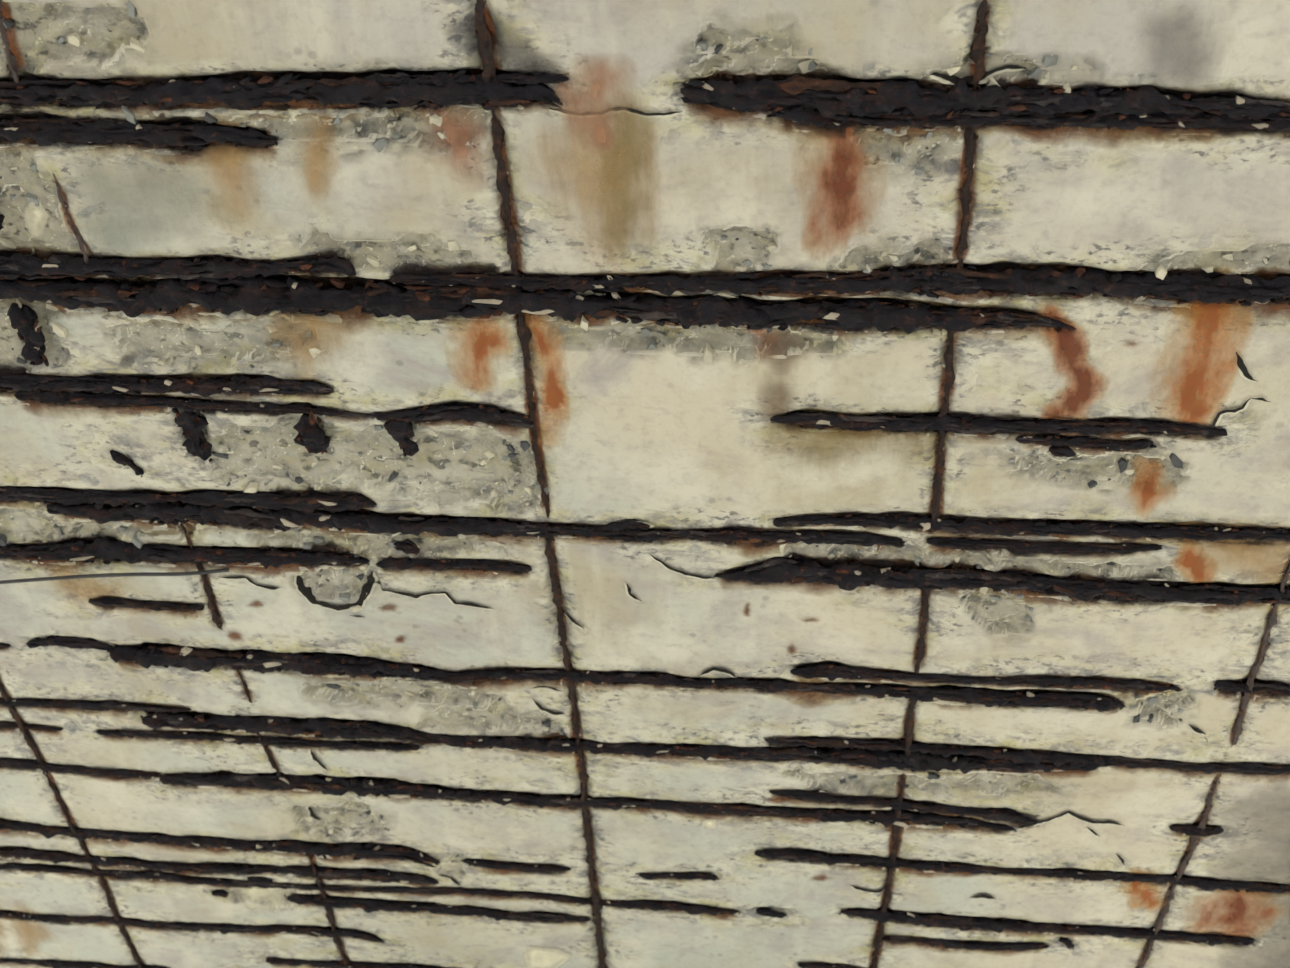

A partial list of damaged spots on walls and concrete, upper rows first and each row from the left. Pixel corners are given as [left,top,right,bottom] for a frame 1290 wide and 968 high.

corrosion [0,69,569,191]
spalling [204,106,522,277]
crack [549,107,683,118]
corrosion [680,72,1290,245]
corrosion [0,247,1290,612]
spalling [929,330,957,523]
crack [1209,352,1269,429]
corrosion [88,595,204,616]
crack [219,571,494,617]
spalling [212,309,607,968]
spalling [0,682,143,968]
corrosion [754,848,1290,953]